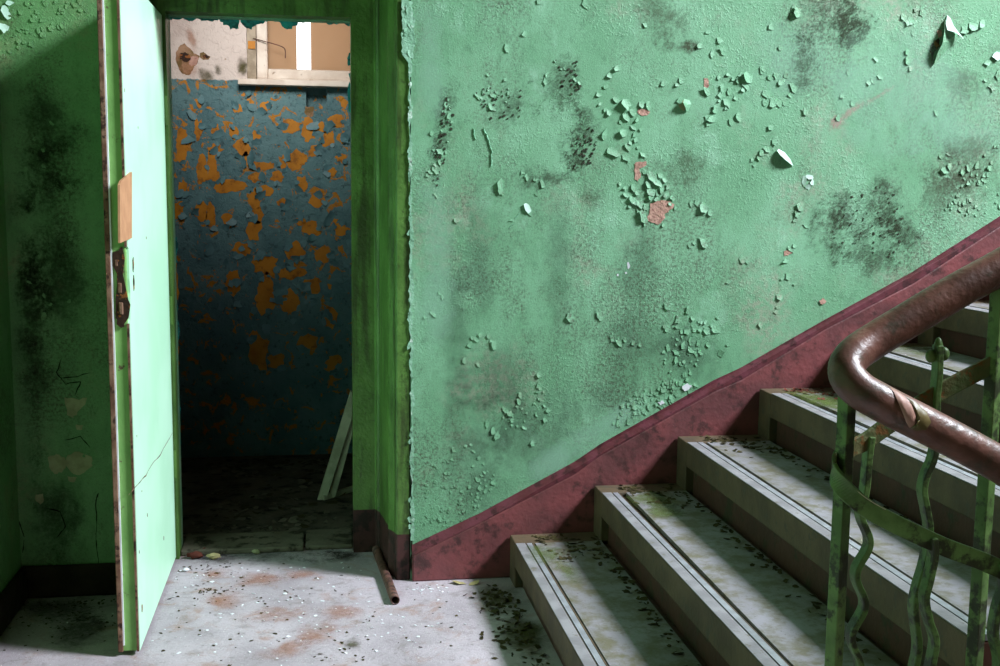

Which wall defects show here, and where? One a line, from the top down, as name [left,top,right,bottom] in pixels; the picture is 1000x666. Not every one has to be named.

spalling [176,43,210,75]
peeling [475,73,522,120]
peeling [543,60,582,95]
peeling [704,66,798,126]
peeling [175,88,352,372]
peeling [426,97,454,199]
peeling [572,65,677,227]
peeling [689,199,714,216]
peeling [939,144,999,217]
crack [56,360,88,395]
peeling [485,372,551,440]
peeling [610,299,730,428]